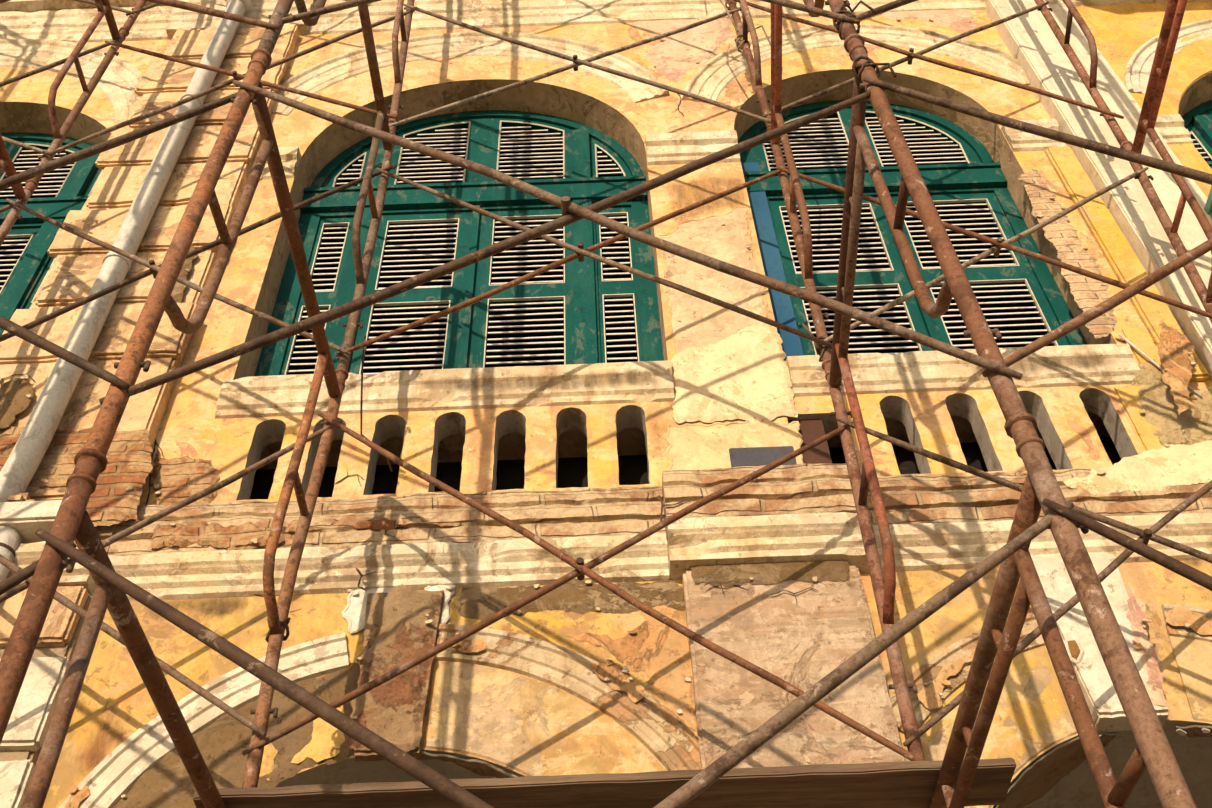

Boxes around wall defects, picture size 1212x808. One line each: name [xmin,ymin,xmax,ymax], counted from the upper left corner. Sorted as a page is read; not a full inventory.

flaking render [1017,169,1118,339]
spalling [1156,319,1197,414]
flaking render [0,374,34,471]
flaking render [28,428,92,492]
flaking render [86,429,220,527]
flaking render [424,560,850,732]
peeling [1126,581,1212,706]
peeling [1175,725,1212,740]